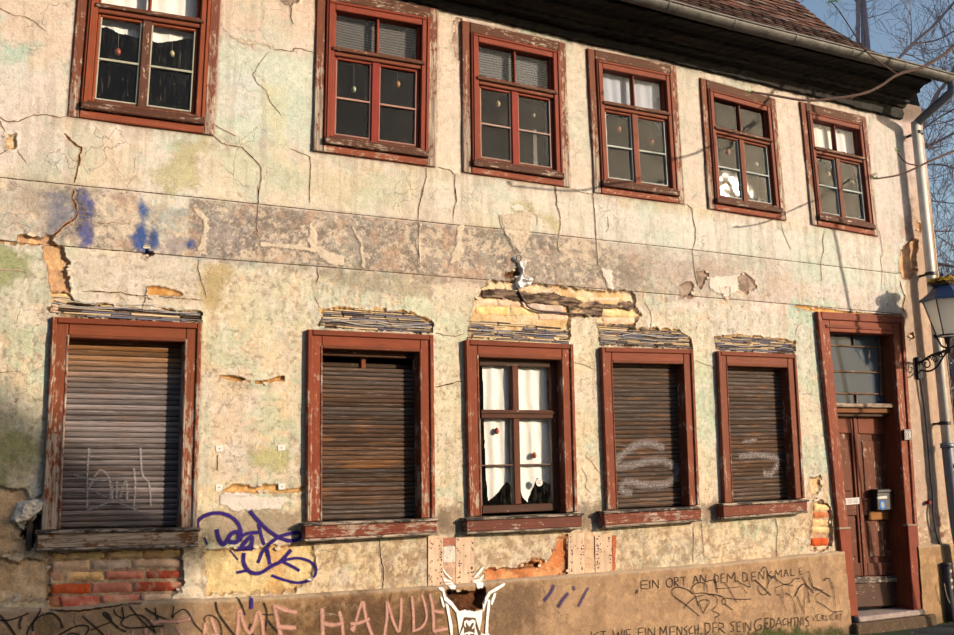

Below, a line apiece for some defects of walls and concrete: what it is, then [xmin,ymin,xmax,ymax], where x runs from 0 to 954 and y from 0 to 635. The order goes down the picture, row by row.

crack [286,0,295,23]
crack [253,47,315,115]
crack [0,114,132,236]
flaking render [0,232,203,323]
crack [213,124,262,236]
crack [290,148,312,200]
crack [417,167,457,265]
flaking render [467,267,693,349]
flaking render [898,220,921,280]
flaking render [0,486,185,609]
flaking render [446,533,570,612]
flaking render [808,474,834,553]